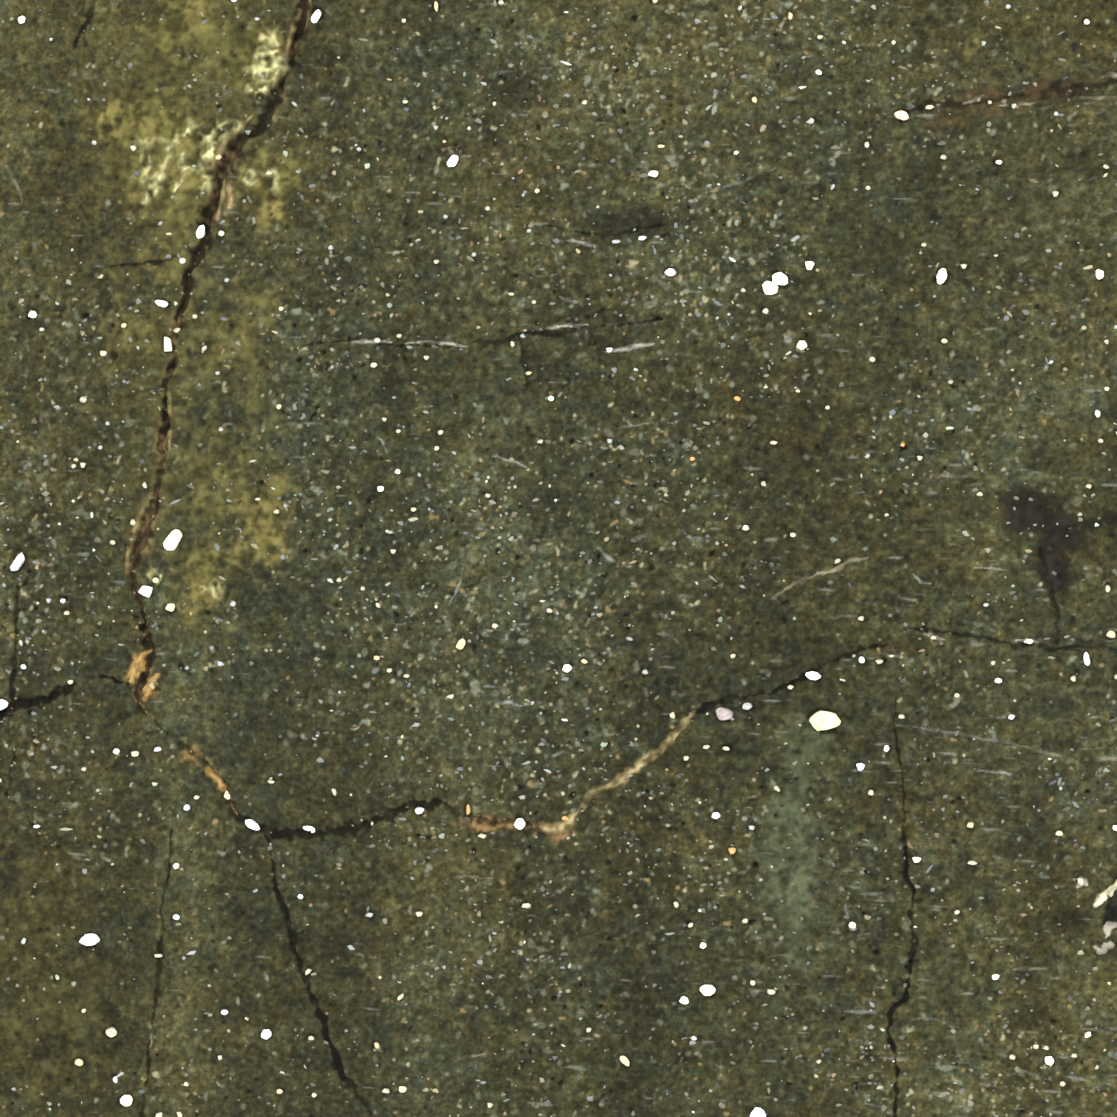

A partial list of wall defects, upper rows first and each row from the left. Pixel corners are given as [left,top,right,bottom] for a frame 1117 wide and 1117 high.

crack [74,20,90,49]
crack [100,0,311,717]
crack [348,337,465,347]
crack [511,324,588,352]
crack [611,319,658,352]
crack [815,558,861,575]
crack [0,662,69,721]
crack [526,646,881,834]
crack [895,704,916,928]
crack [227,798,445,1099]
spalling [1093,875,1117,955]
crack [887,962,912,1117]